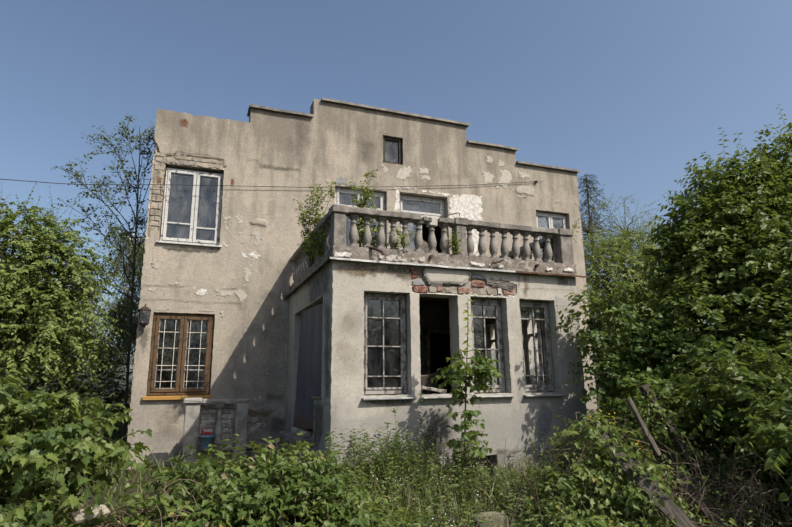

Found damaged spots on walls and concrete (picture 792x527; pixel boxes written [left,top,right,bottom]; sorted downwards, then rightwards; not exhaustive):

flaking render [482,156,535,197]
flaking render [193,215,263,302]
spalling [378,164,517,296]